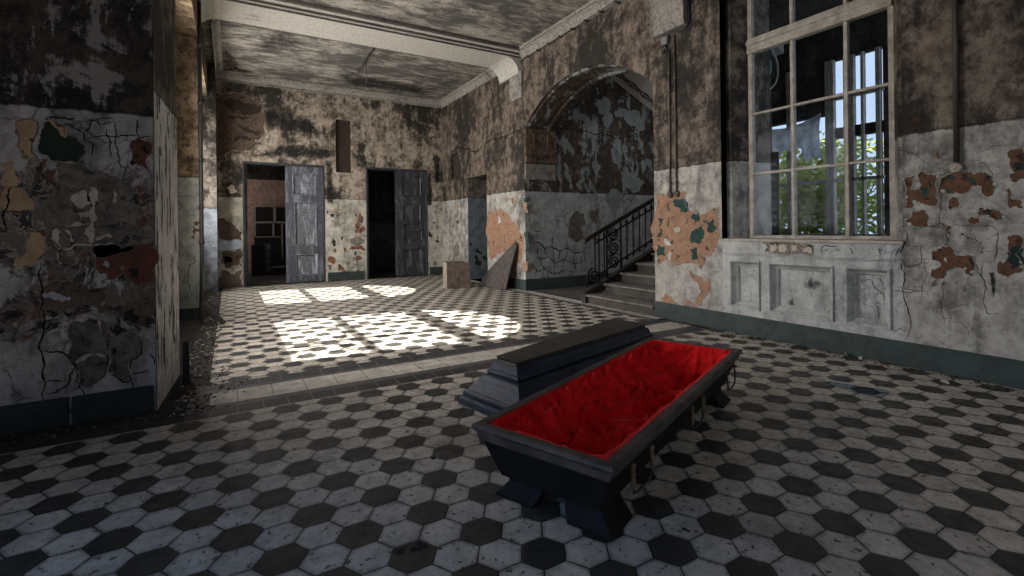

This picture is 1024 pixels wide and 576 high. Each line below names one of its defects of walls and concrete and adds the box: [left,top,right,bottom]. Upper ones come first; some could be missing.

water stain [342,75,427,92]
crack [45,116,152,168]
crack [447,104,524,192]
crack [1,187,32,232]
peeling [0,0,180,410]
flaking render [218,208,243,288]
peeling [327,212,365,272]
peeling [454,197,529,277]
crack [532,199,641,277]
peeling [650,191,721,308]
crack [861,169,1011,339]
peeling [902,146,1024,280]